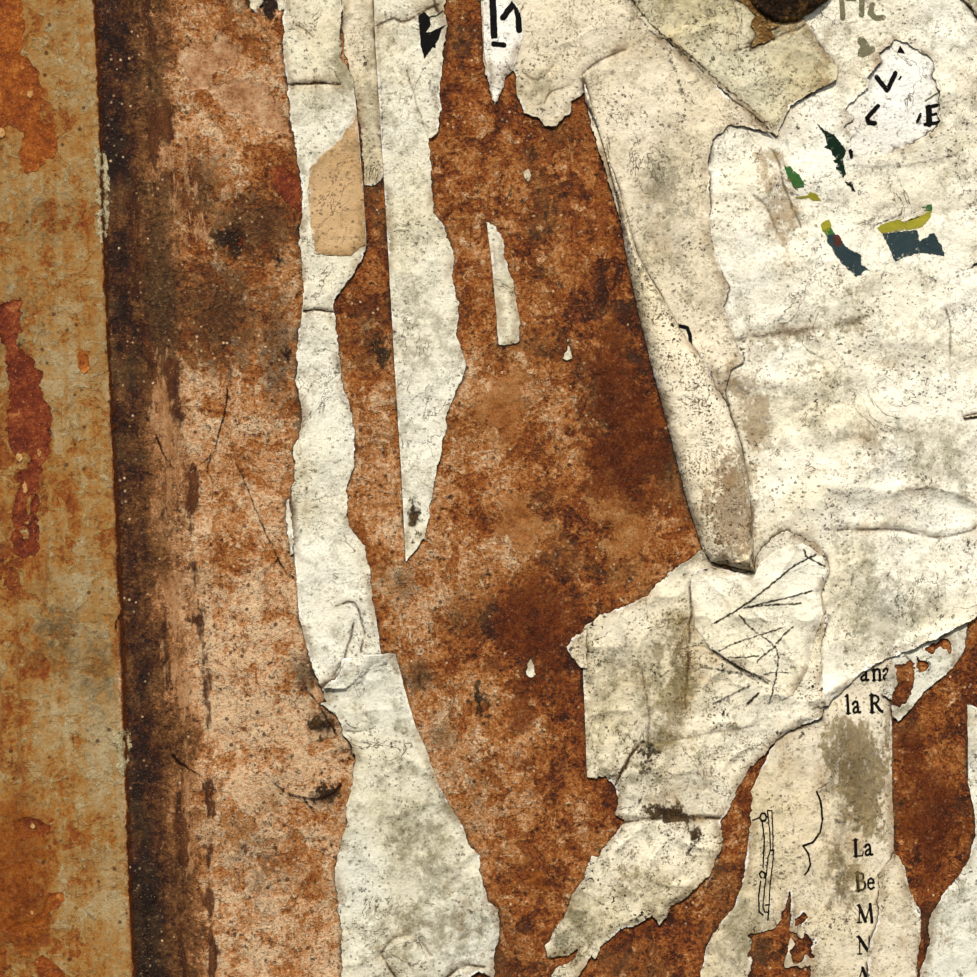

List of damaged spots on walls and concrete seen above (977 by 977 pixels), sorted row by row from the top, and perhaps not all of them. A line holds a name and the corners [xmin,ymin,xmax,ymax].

spalling [246,0,287,21]
water stain [144,98,176,168]
water stain [93,147,110,244]
water stain [143,337,185,422]
water stain [184,463,199,530]
flaking render [489,490,545,573]
flaking render [583,474,663,584]
water stain [191,602,212,728]
corrosion [498,572,586,734]
water stain [173,790,189,869]
water stain [202,779,217,816]
water stain [203,886,220,977]